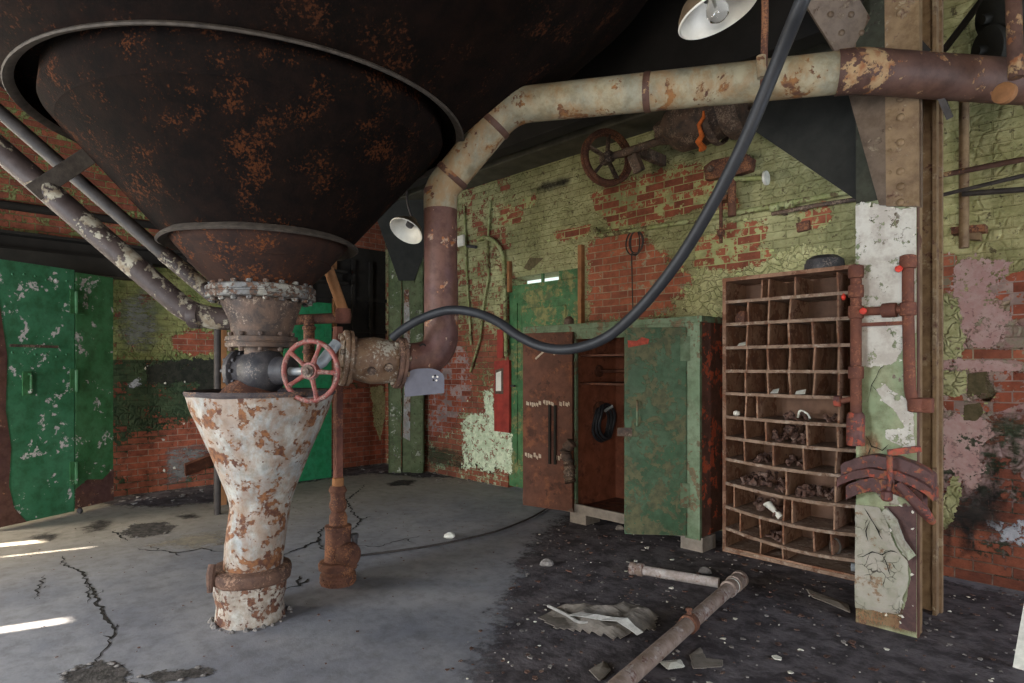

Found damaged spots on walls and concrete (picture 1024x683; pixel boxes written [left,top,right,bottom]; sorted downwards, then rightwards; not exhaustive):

peeling [546,160,779,323]
peeling [856,202,916,368]
peeling [115,418,208,480]
peeling [427,345,513,475]
peeling [876,383,915,447]
peeling [943,252,1024,530]
crack [34,556,118,662]
crack [286,527,325,554]
crack [863,508,897,574]
peeling [884,504,916,632]
damp [946,490,1024,562]
spalling [58,660,216,683]